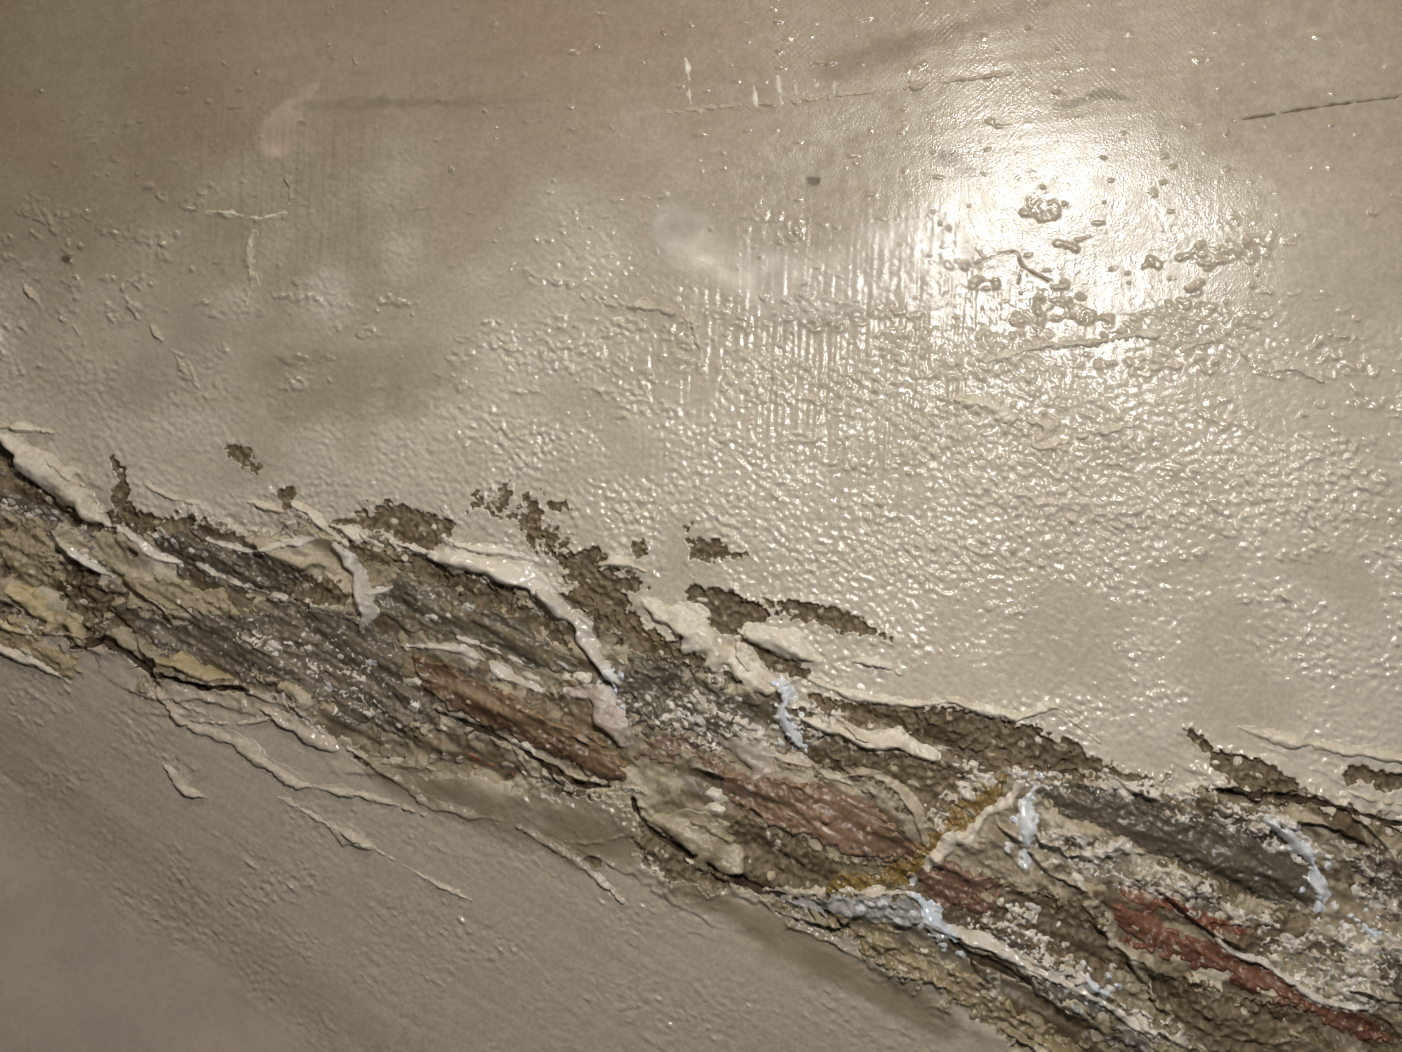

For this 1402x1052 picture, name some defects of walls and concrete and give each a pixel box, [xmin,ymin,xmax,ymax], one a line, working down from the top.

crack [1241,96,1399,120]
spalling [0,443,1402,1052]
rust [412,654,1006,928]
rust [1105,880,1402,1044]